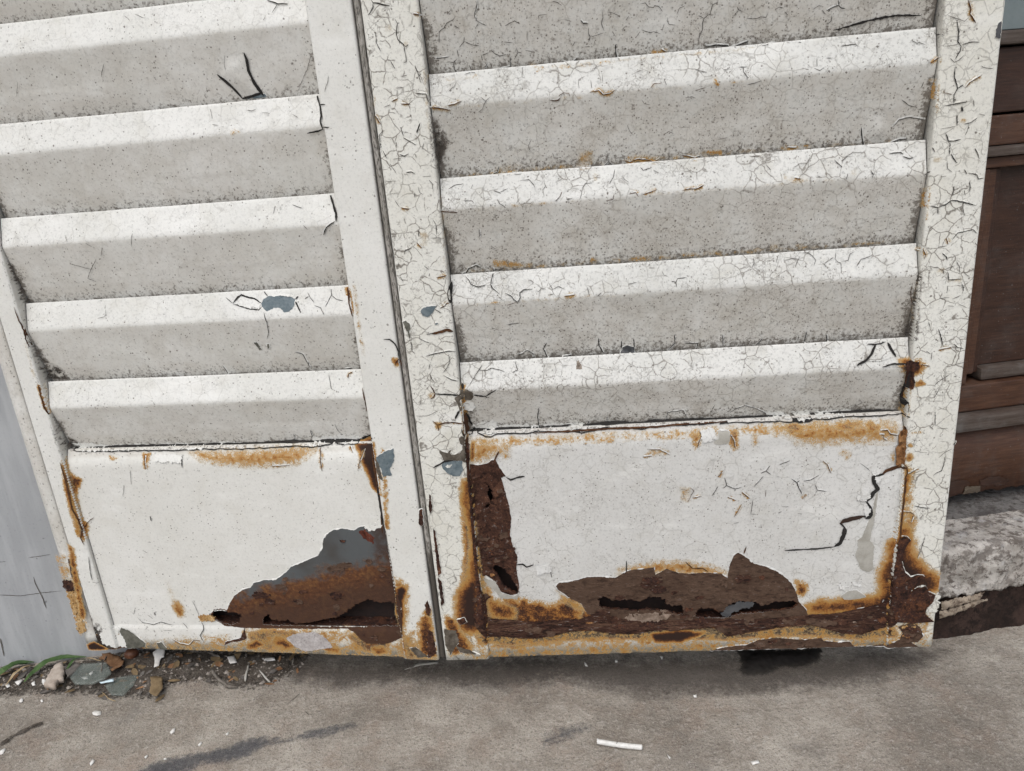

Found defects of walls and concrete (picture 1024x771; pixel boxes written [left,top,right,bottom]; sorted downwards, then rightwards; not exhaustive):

crack [368,0,993,558]
peeling [228,292,301,350]
corrosion [898,357,926,415]
peeling [375,448,395,481]
corrosion [712,420,897,459]
corrosion [56,468,127,649]
peeling [198,520,402,664]
corrosion [146,429,941,660]
peeling [554,548,809,625]